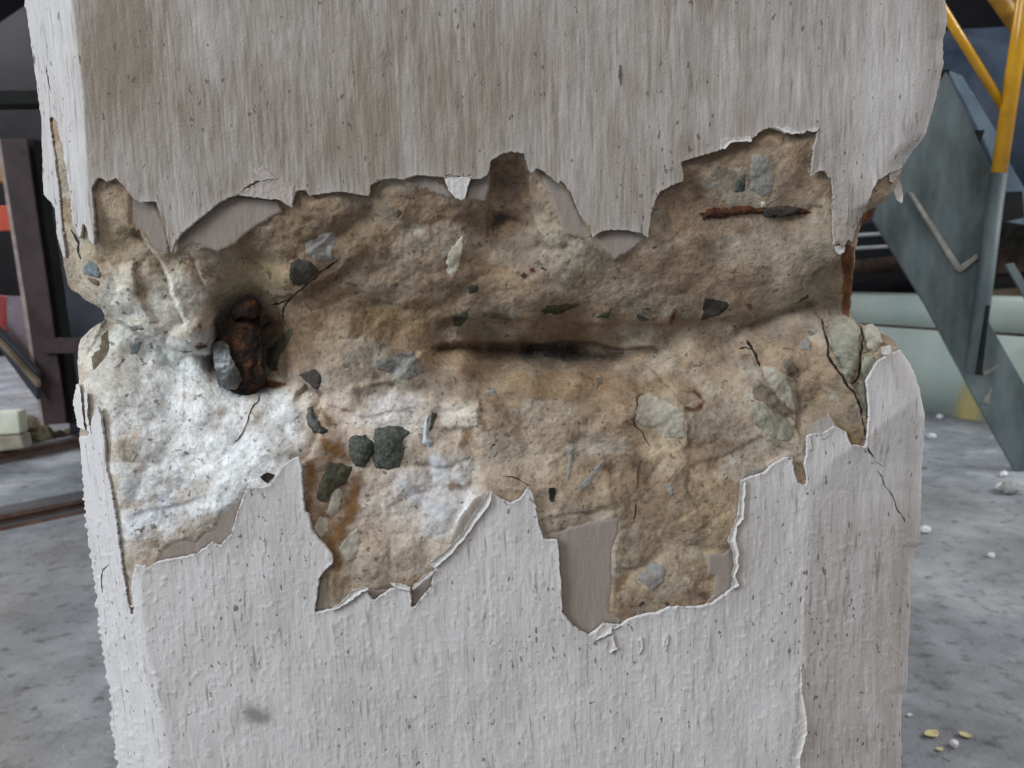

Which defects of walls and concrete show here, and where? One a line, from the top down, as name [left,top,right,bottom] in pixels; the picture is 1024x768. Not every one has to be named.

crack [261,260,339,331]
rust [841,244,855,316]
spalling [51,118,903,654]
water stain [505,343,596,358]
crack [821,318,905,521]